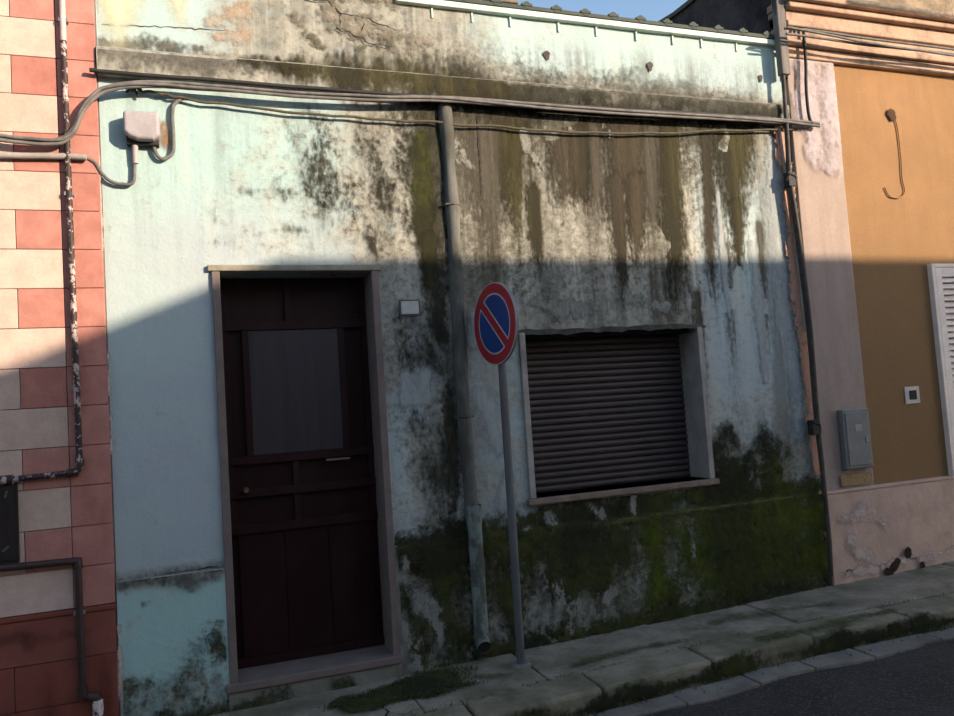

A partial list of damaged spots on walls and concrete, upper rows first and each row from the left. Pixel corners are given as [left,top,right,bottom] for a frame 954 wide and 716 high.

peeling [205,4,250,43]
spalling [286,12,326,50]
crack [313,0,406,47]
spalling [316,0,435,53]
leakage [850,0,954,17]
leakage [301,107,360,220]
leakage [356,79,783,535]
spalling [884,547,926,576]
leakage [122,621,229,716]